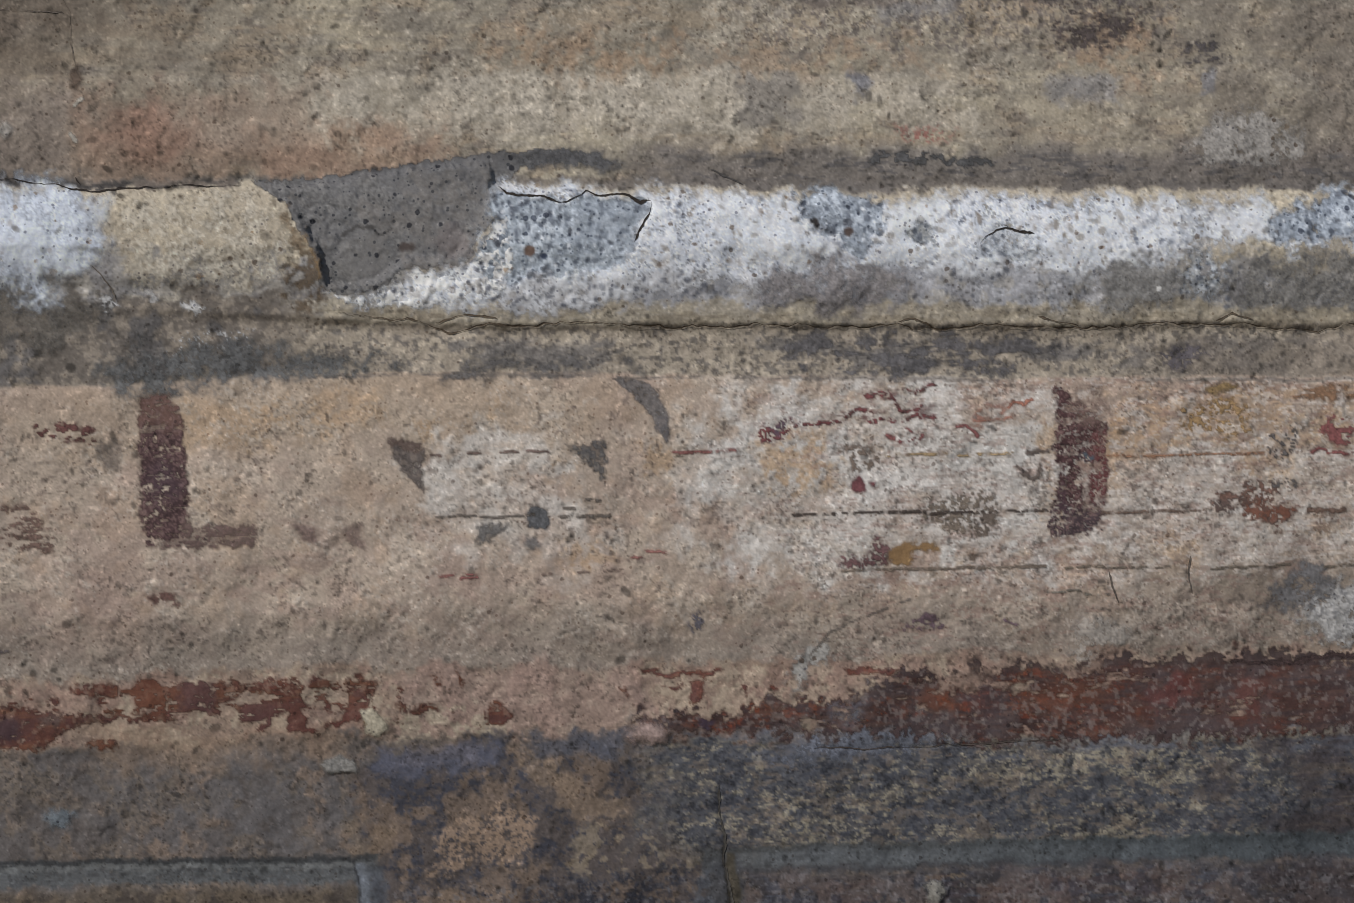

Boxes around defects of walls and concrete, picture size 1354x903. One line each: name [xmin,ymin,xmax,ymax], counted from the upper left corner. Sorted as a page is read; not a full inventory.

damp [516,148,621,174]
damp [869,150,994,168]
crack [500,187,652,242]
damp [180,301,206,316]
damp [328,217,513,310]
crack [335,312,1354,334]
damp [759,254,1061,382]
damp [1101,254,1176,313]
damp [1238,252,1354,310]